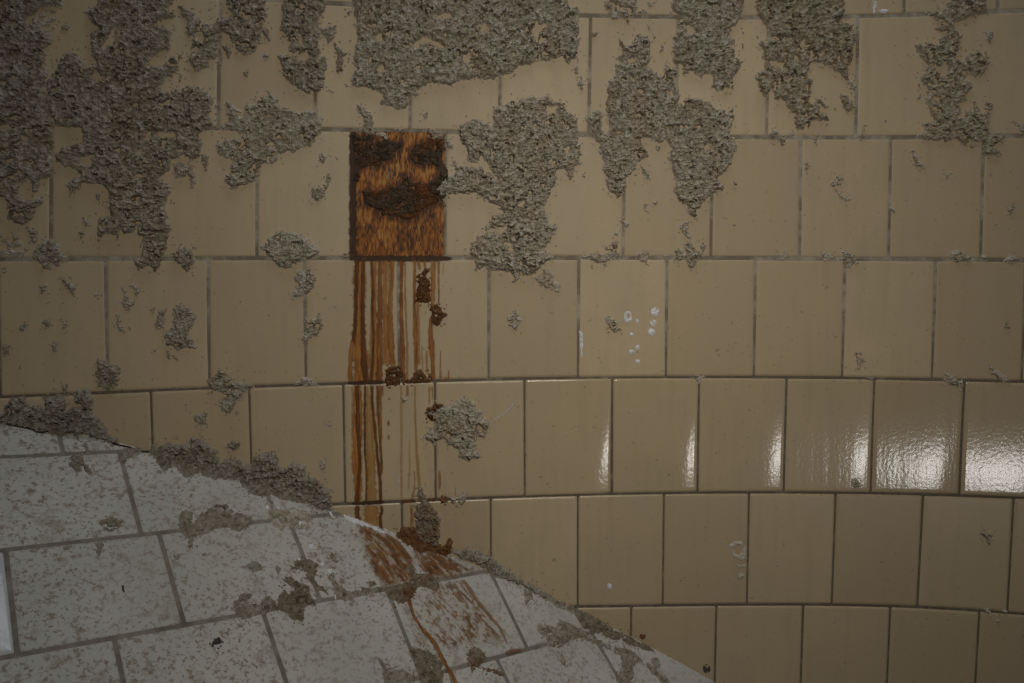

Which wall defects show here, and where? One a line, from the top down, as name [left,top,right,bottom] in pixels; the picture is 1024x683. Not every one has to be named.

corrosion [348,125,520,683]